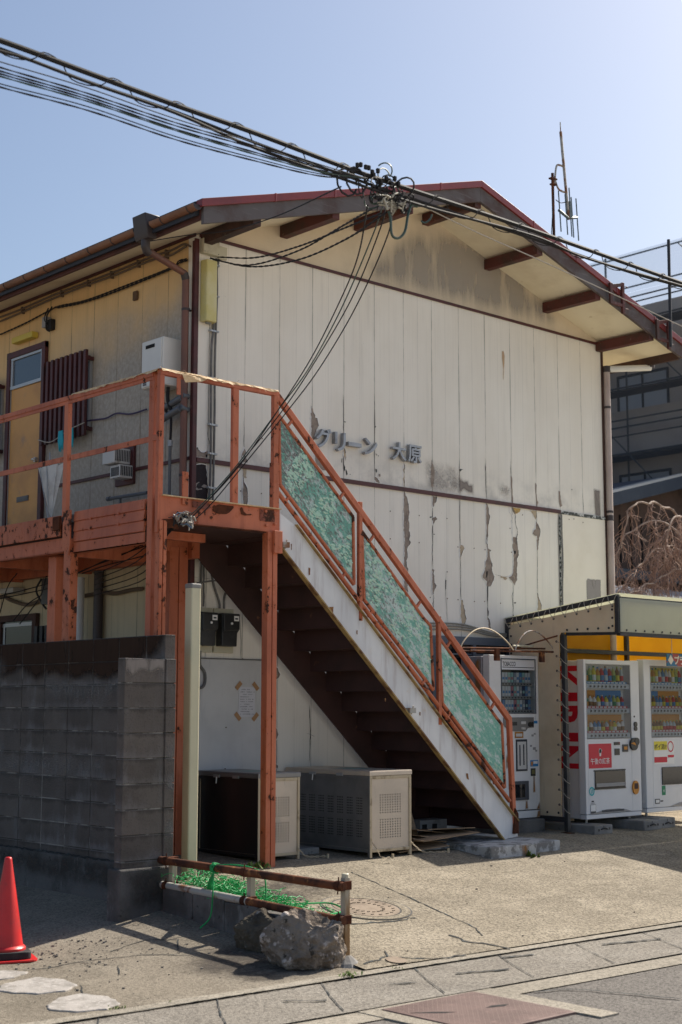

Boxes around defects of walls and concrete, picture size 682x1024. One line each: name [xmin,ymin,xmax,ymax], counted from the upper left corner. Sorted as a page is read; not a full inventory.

water stain [378,241,543,315]
rust [192,500,275,522]
peeling [285,406,353,572]
peeling [366,463,432,674]
water stain [430,469,472,492]
spalling [481,503,495,587]
spalling [508,476,541,586]
crack [54,872,681,1024]